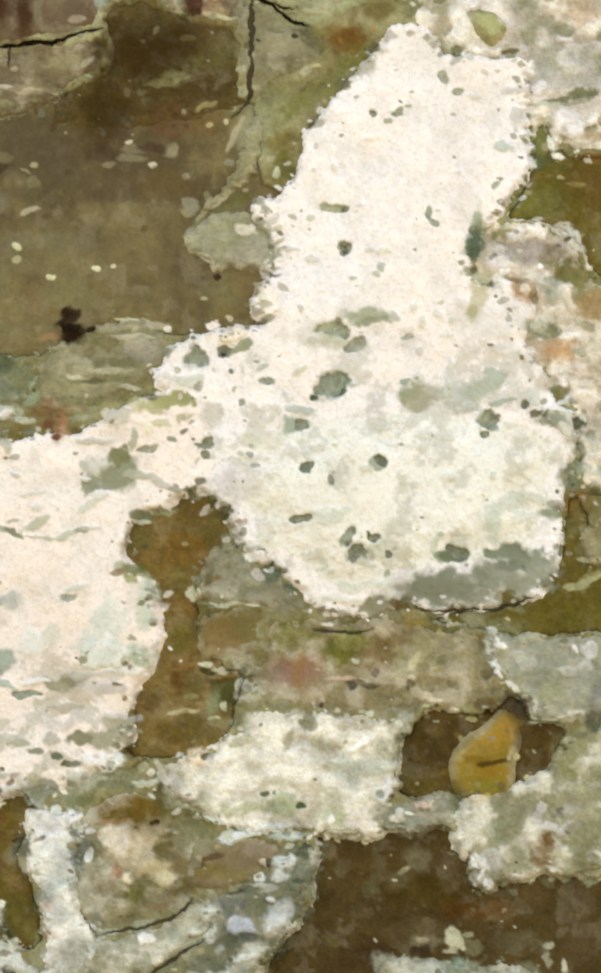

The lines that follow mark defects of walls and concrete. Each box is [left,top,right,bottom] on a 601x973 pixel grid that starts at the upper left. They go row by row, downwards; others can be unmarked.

crack [0,28,100,62]
crack [231,0,310,118]
flaking render [152,23,601,636]
flaking render [0,388,244,949]
spalling [399,698,564,798]
spalling [268,829,601,973]